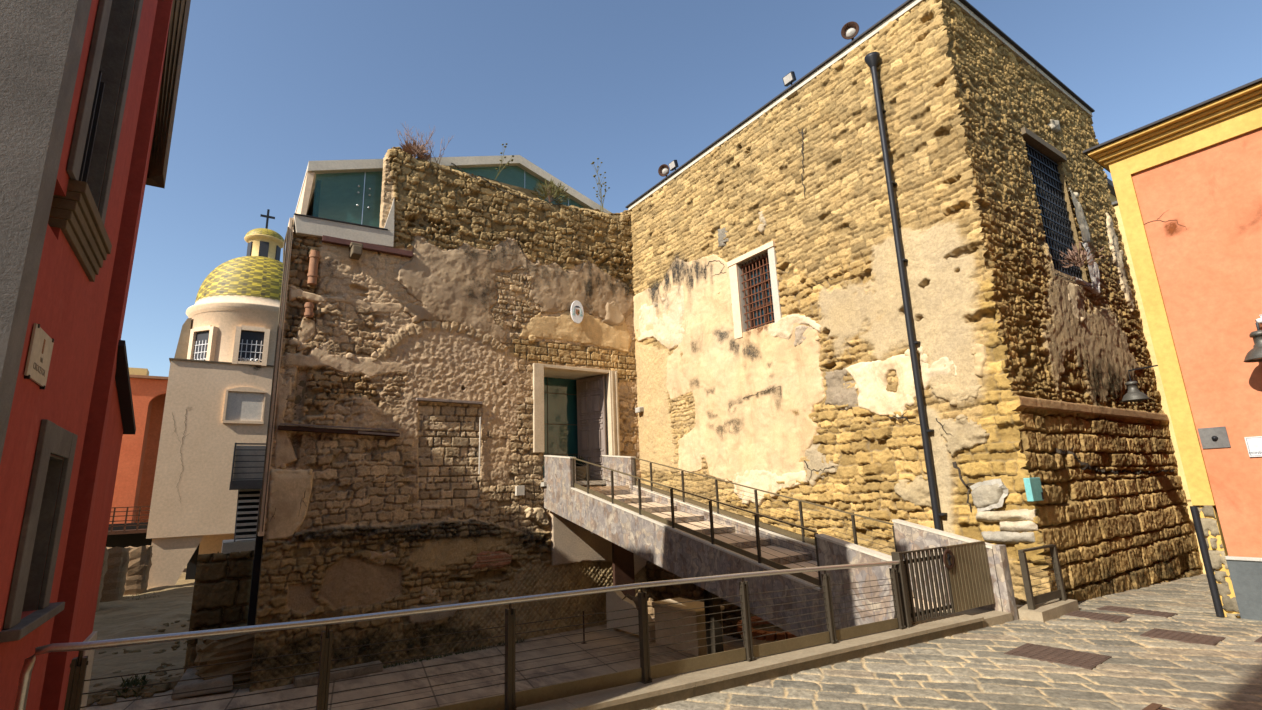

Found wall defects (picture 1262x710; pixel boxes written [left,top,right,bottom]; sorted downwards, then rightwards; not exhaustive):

flaking render [289,235,826,506]
flaking render [842,344,957,423]
flaking render [971,343,988,377]
flaking render [264,317,408,540]
flaking render [524,507,549,527]